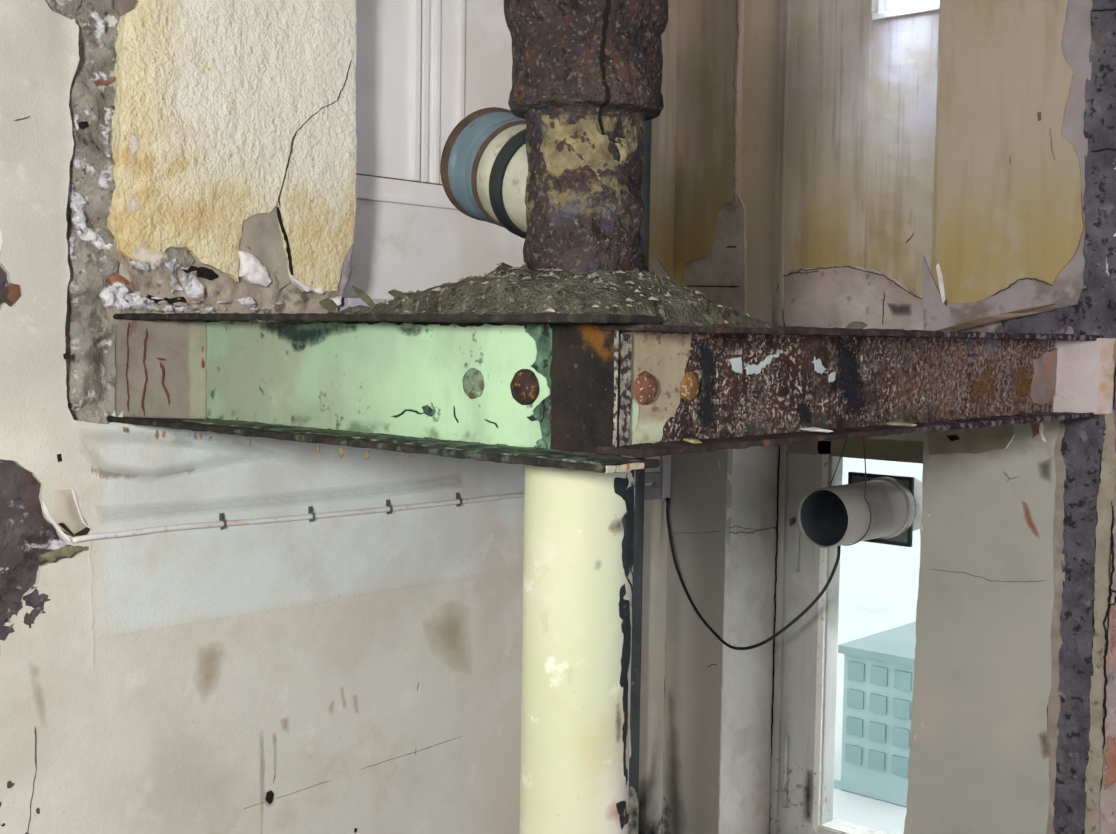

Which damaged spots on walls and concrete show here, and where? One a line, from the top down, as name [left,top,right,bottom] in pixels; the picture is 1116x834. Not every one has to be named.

spalling [94,77,115,86]
spalling [113,0,138,16]
water stain [132,247,166,265]
spalling [99,207,354,325]
crack [277,60,352,275]
spalling [731,0,741,213]
peeling [774,0,1093,332]
spalling [0,459,89,641]
peeling [614,470,635,785]
crack [933,569,1046,583]
peeling [1100,493,1116,834]
peeling [616,801,629,829]